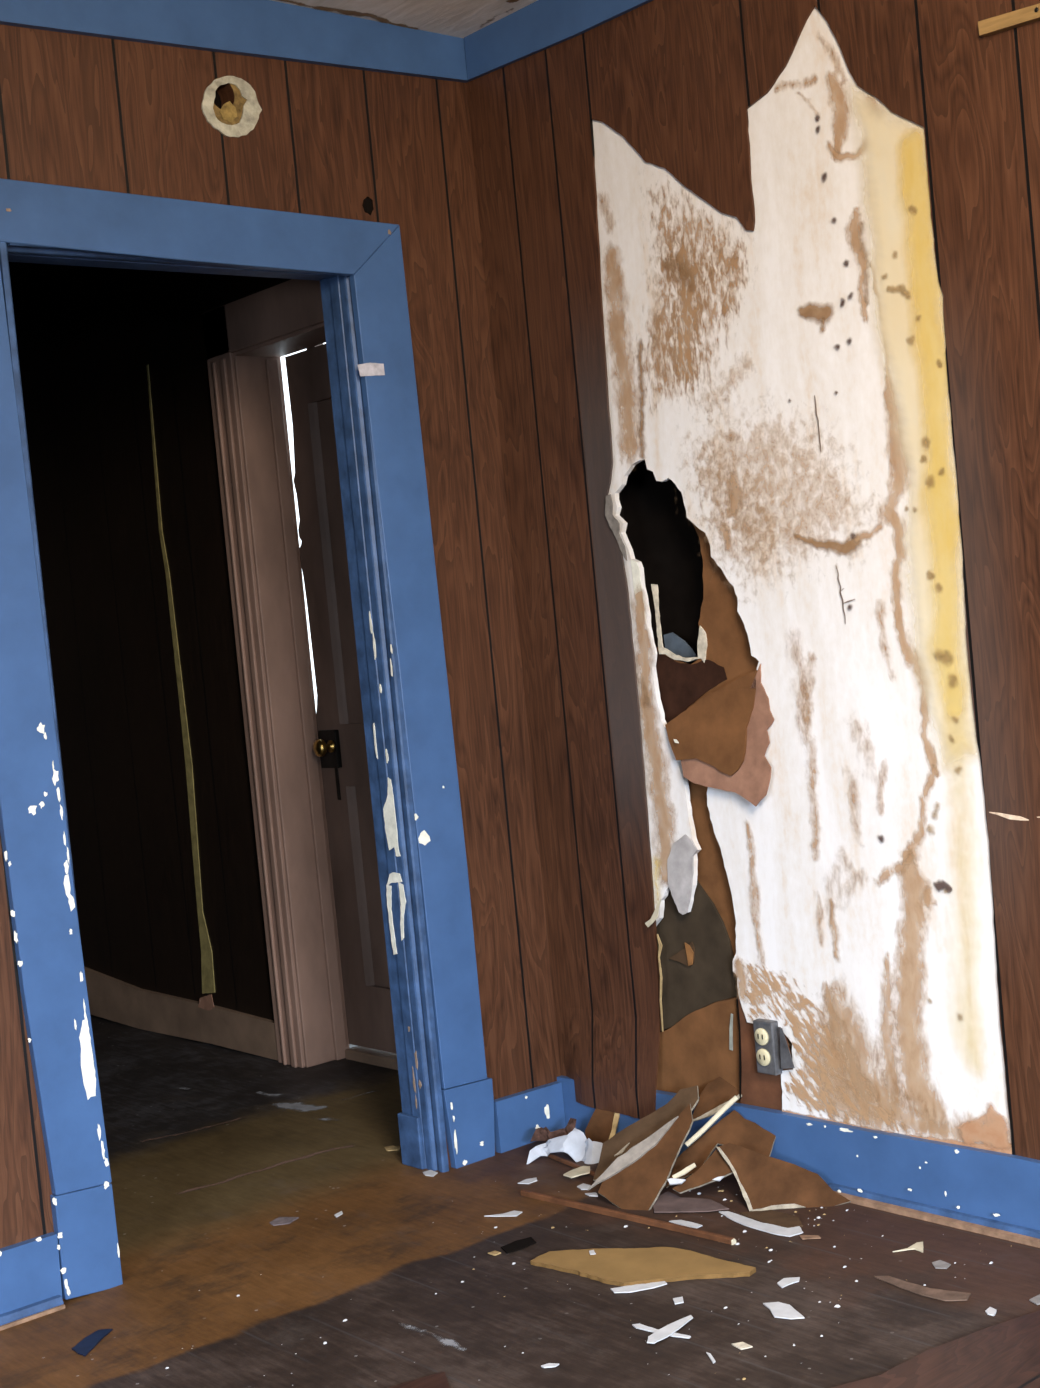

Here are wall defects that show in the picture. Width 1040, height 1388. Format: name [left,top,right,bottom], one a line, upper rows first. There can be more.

water stain [605,192,743,459]
peeling [369,611,393,693]
water stain [713,50,974,1142]
peeling [28,761,75,911]
peeling [373,723,406,955]
peeling [414,814,430,845]
spalling [605,460,793,1111]